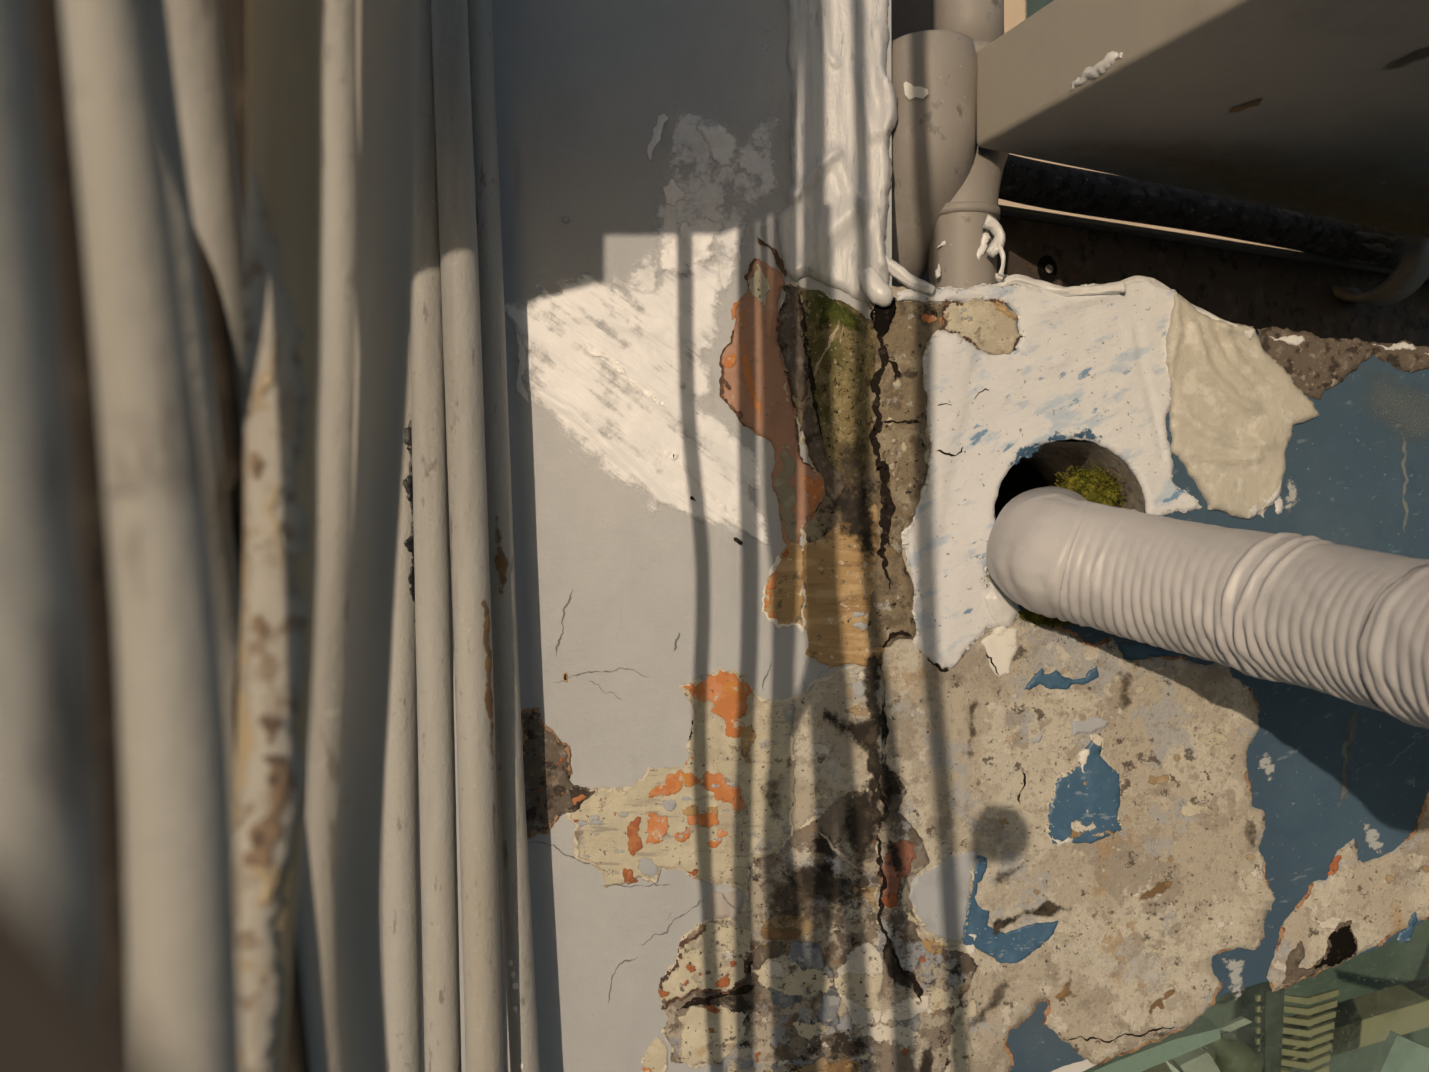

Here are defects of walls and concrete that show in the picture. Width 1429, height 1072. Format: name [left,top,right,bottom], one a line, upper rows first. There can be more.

crack [798,290,822,437]
crack [869,331,988,589]
peeling [233,167,310,1072]
crack [882,630,949,672]
flaking render [521,237,1429,1072]
crack [820,779,923,1002]